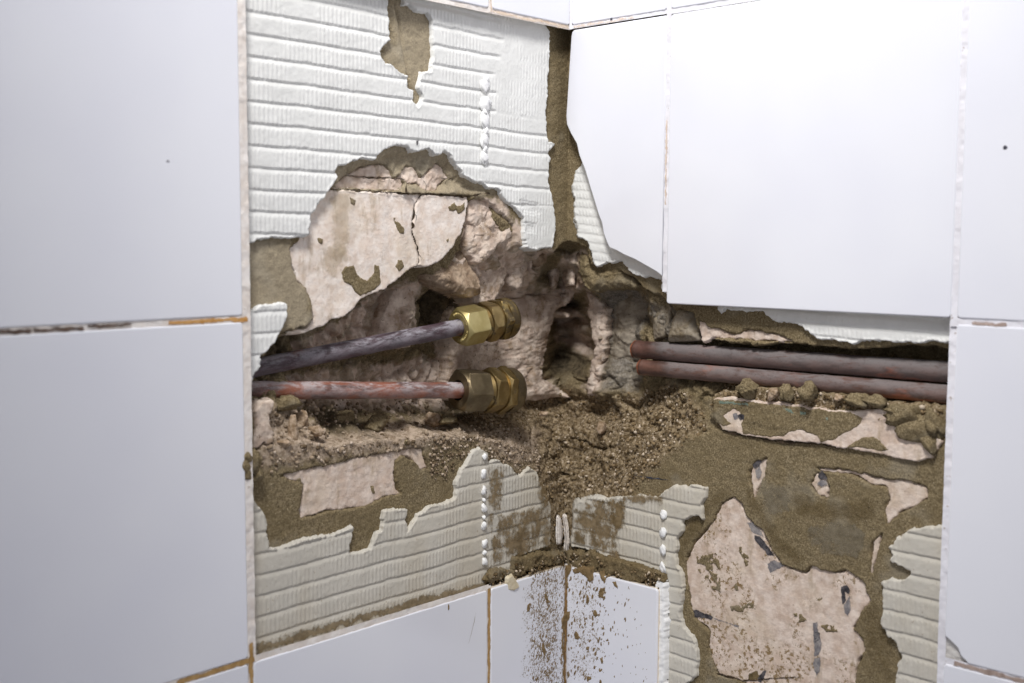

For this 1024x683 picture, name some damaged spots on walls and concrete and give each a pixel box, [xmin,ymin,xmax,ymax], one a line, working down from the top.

crack [332,175,490,263]
spalling [285,164,467,336]
spalling [699,321,792,344]
spalling [252,397,274,448]
spalling [283,448,426,518]
spalling [751,459,767,497]
spalling [812,468,928,523]
peeling [504,573,519,591]
spalling [687,497,882,683]